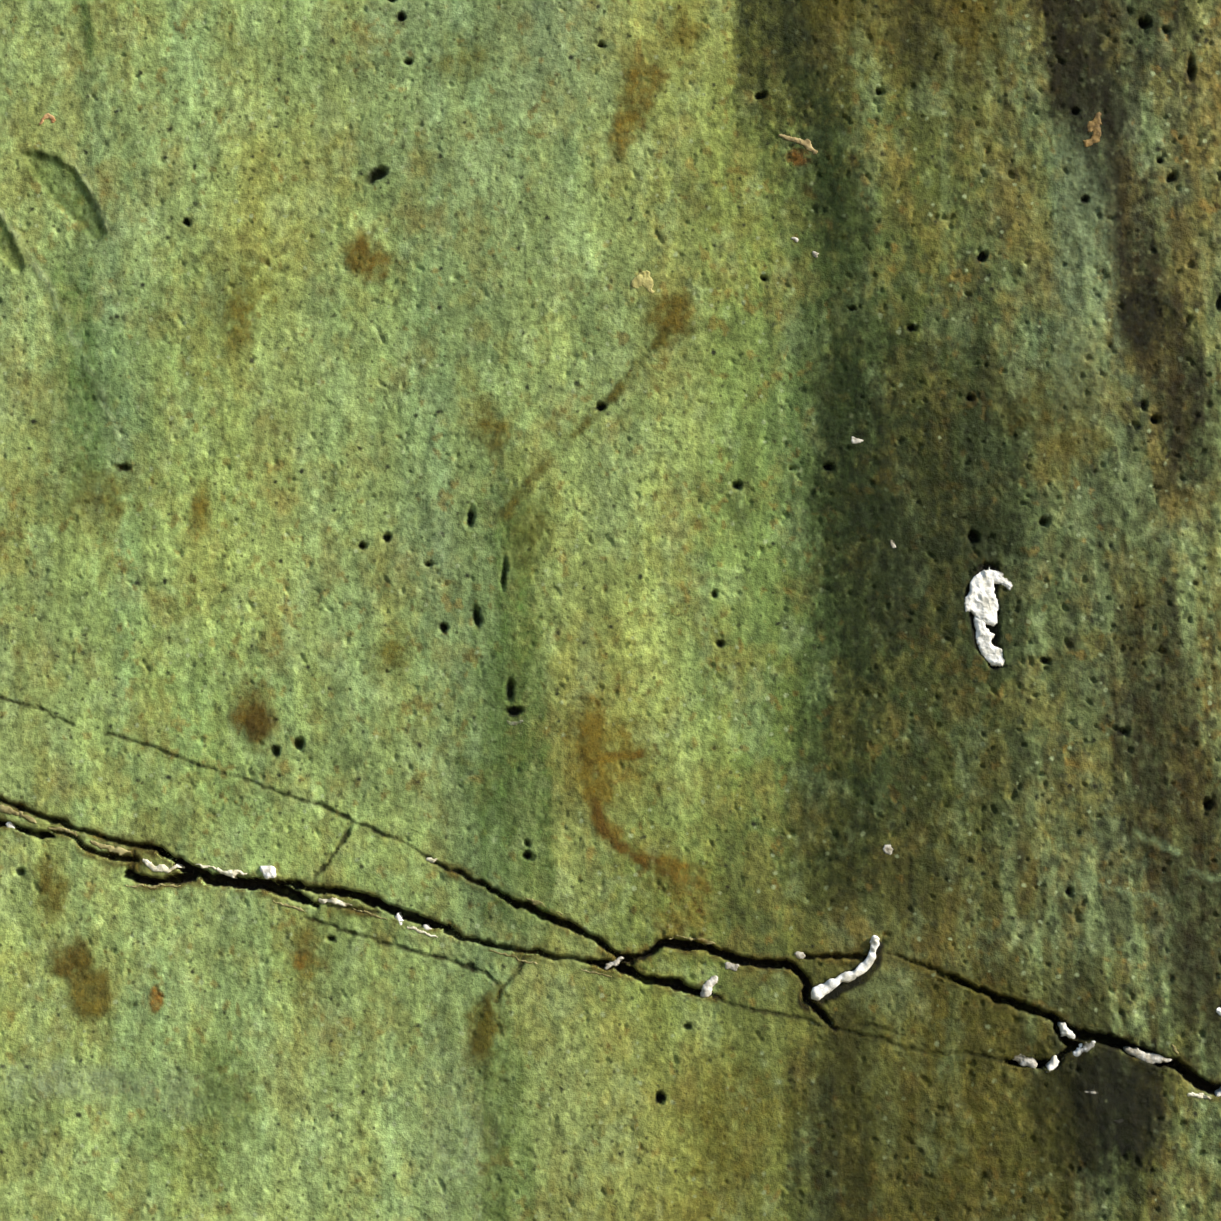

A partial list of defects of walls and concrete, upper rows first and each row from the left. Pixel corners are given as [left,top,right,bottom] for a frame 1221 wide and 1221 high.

corrosion [347,236,390,277]
leakage [738,0,1028,699]
leakage [1043,0,1216,480]
crack [0,697,55,718]
corrosion [230,689,275,743]
corrosion [576,697,707,920]
leakage [1113,601,1221,1050]
corrosion [53,939,110,1016]
crack [0,795,1221,1101]
leakage [791,979,1173,1221]